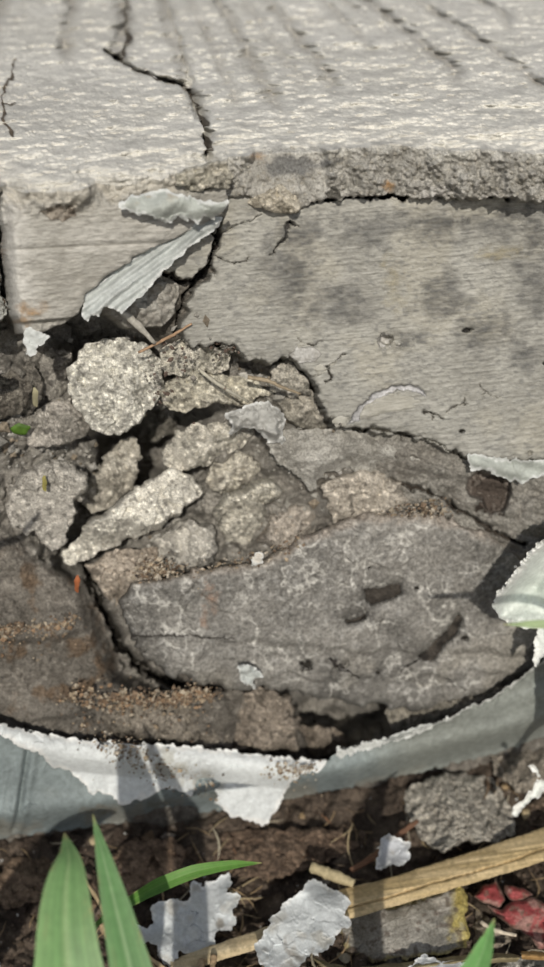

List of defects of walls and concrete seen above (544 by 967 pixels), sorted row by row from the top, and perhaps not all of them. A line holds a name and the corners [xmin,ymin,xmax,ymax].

crack [1,59,17,137]
crack [109,0,214,154]
crack [273,221,297,253]
crack [163,228,248,334]
spalling [288,342,327,375]
spalling [332,384,426,427]